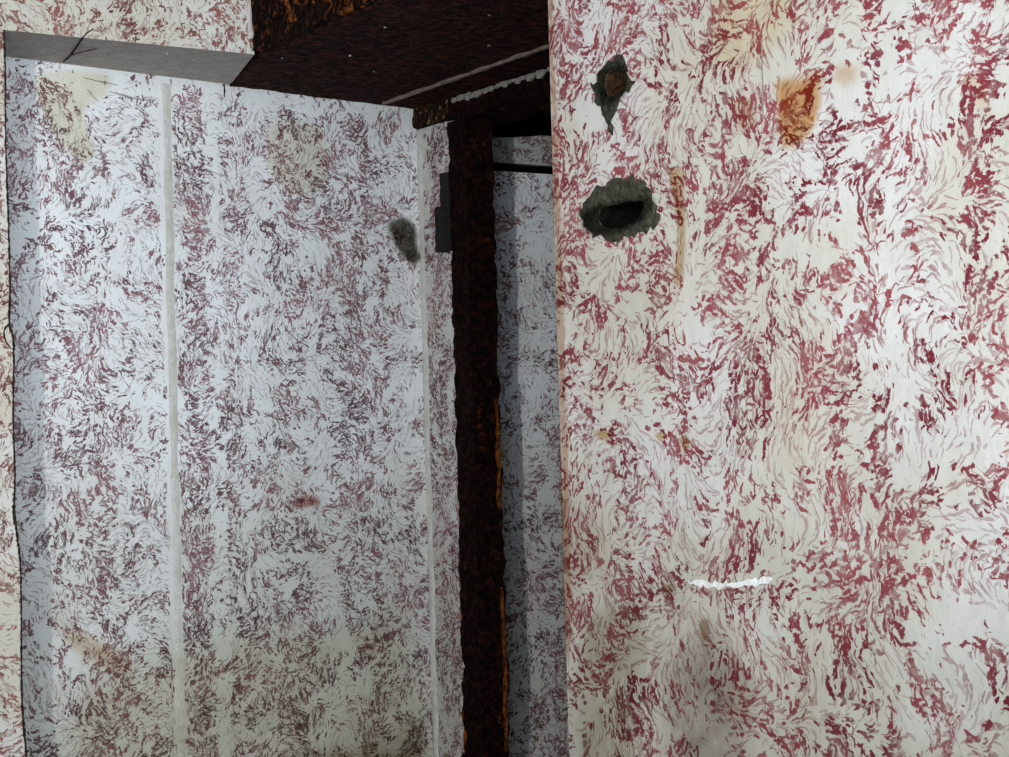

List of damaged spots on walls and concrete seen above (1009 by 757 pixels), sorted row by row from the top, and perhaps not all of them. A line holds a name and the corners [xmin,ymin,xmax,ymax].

crack [0,30,28,757]